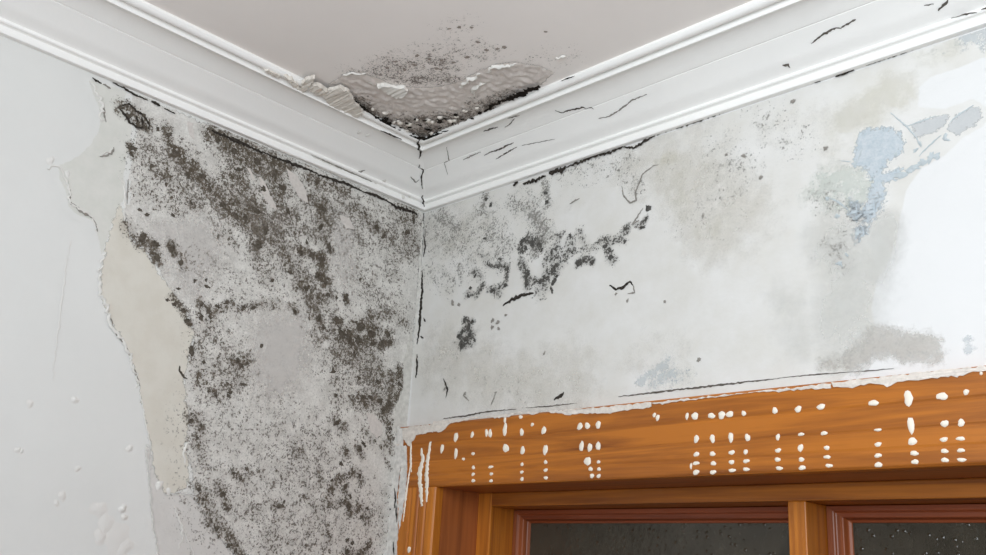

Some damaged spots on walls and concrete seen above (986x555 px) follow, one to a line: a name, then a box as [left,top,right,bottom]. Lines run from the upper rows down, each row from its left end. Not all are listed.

crack [811,19,856,44]
crack [924,0,986,18]
crack [92,77,175,114]
spalling [263,62,574,140]
crack [513,114,720,225]
peeling [825,105,983,242]
crack [211,116,554,378]
water stain [114,25,986,471]
flaking render [48,72,424,555]
crack [609,281,635,294]
crack [443,378,574,419]
crack [618,368,893,397]